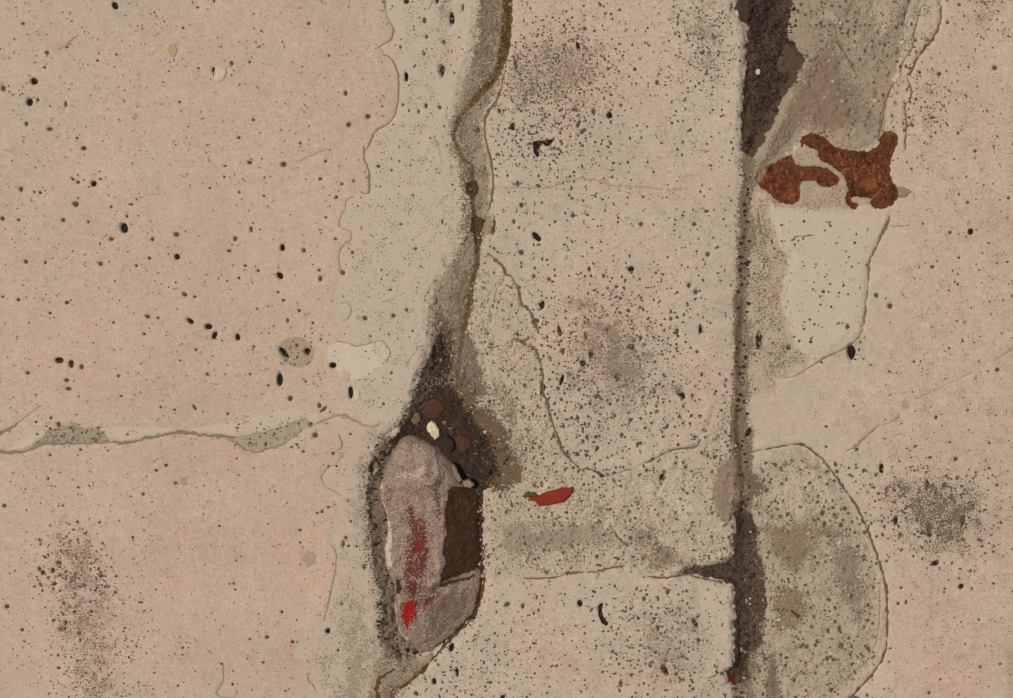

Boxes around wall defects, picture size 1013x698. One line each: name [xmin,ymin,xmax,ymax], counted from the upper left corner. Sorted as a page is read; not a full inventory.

crack [338,0,400,271]
crack [451,0,701,477]
crack [743,158,763,261]
rust [759,131,897,207]
spalling [277,337,314,386]
crack [337,302,420,367]
peeling [293,0,938,698]
crack [735,300,743,377]
peeling [9,408,321,452]
crack [0,404,384,496]
crack [735,372,972,698]
crack [392,573,486,698]